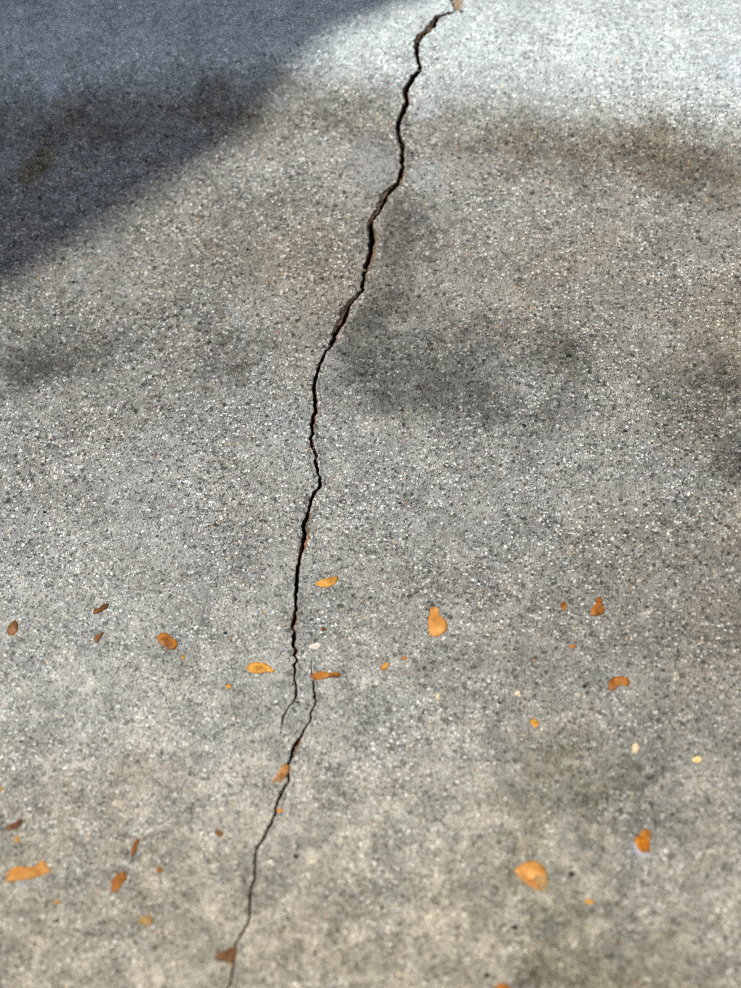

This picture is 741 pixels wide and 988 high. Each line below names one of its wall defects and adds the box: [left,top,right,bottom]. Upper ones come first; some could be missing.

crack [221,7,460,988]